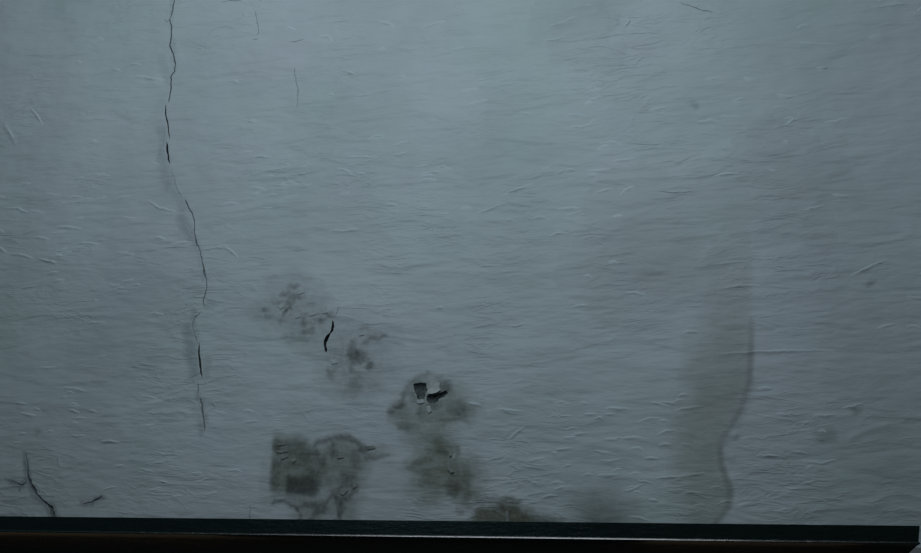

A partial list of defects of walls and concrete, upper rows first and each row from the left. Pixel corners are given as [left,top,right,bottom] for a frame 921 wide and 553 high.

crack [151,0,216,430]
crack [324,309,338,352]
flaking render [413,380,448,413]
crack [12,453,56,517]
water stain [476,506,530,522]